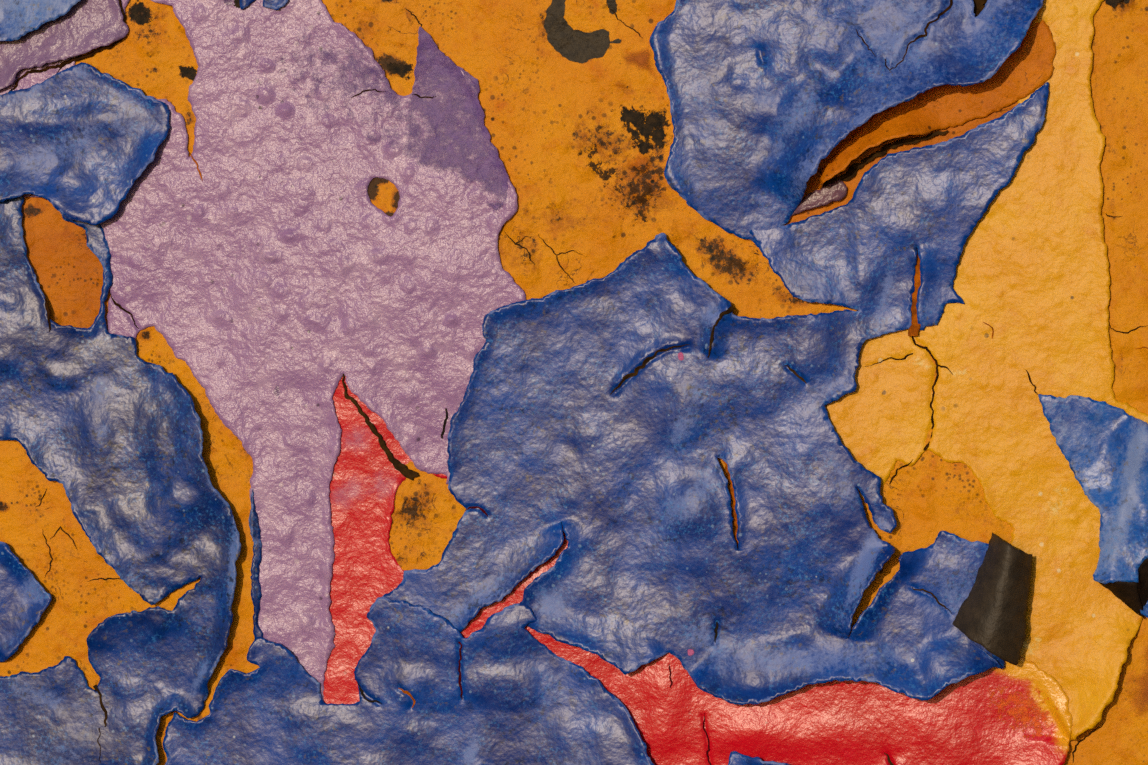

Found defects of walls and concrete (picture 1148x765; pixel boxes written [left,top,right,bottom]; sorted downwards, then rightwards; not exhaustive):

peeling [0,0,198,328]
damp [578,143,648,222]
damp [611,105,670,155]
peeling [0,440,201,691]
peeling [136,326,263,765]
peeling [389,461,466,570]
crack [865,336,953,485]
peeling [848,429,1033,666]